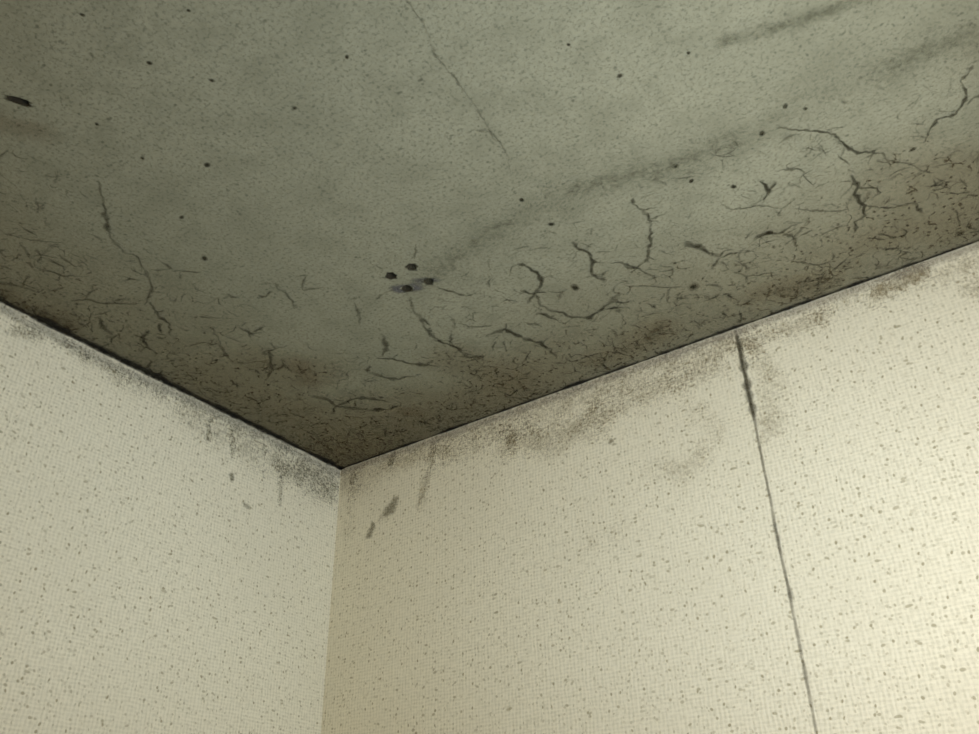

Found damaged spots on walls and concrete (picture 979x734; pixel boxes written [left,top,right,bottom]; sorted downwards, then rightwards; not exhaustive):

crack [931,76,967,128]
crack [798,130,879,226]
damp [866,155,979,258]
damp [0,206,925,465]
crack [0,219,979,470]